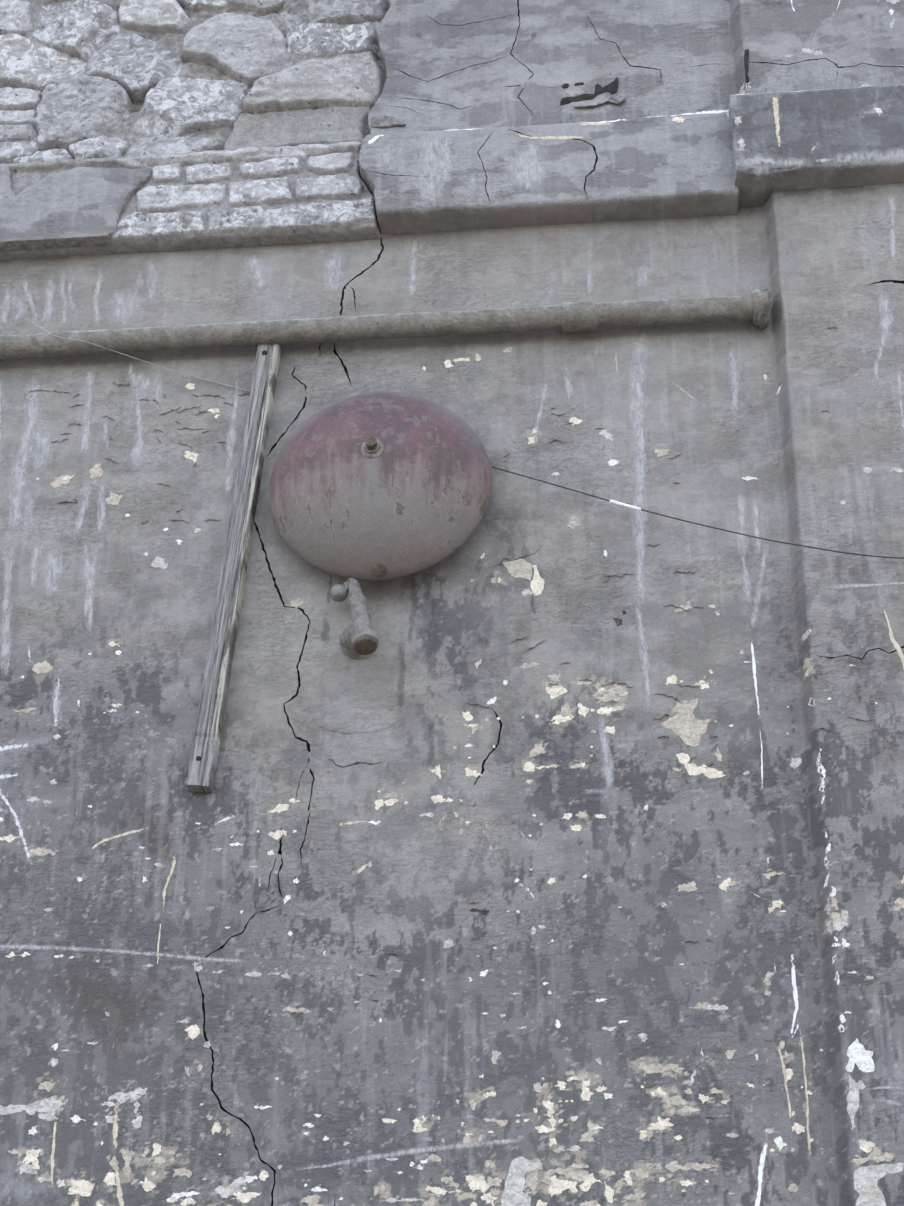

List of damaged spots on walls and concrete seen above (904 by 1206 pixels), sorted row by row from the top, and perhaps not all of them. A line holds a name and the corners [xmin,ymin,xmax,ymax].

crack [366,0,602,204]
crack [582,12,904,82]
crack [265,237,388,459]
peeling [490,558,544,596]
crack [469,704,507,789]
peeling [520,662,628,784]
peeling [661,670,733,779]
crack [190,513,384,1206]
peeling [0,1081,282,1206]
peeling [375,1073,717,1206]
peeling [638,1063,729,1140]
peeling [838,1011,904,1206]